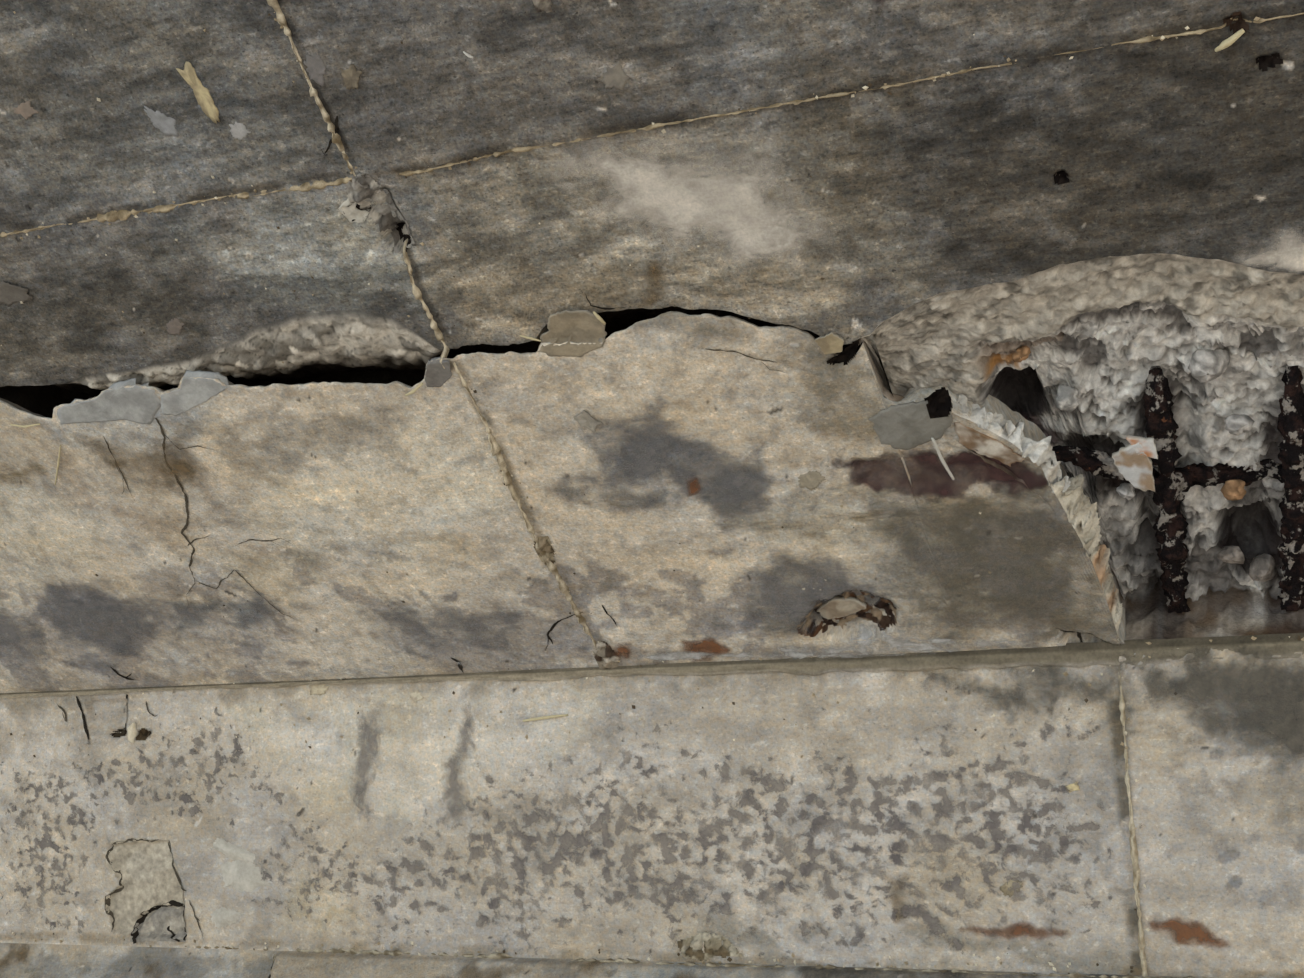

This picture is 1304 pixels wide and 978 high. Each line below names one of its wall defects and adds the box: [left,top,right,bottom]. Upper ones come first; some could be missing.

crack [321,116,339,155]
crack [585,294,894,398]
crack [0,310,549,619]
spalling [857,253,1304,642]
crack [546,605,617,648]
spalling [797,588,897,637]
corrosion [960,924,1064,938]
corrosion [1150,919,1227,947]